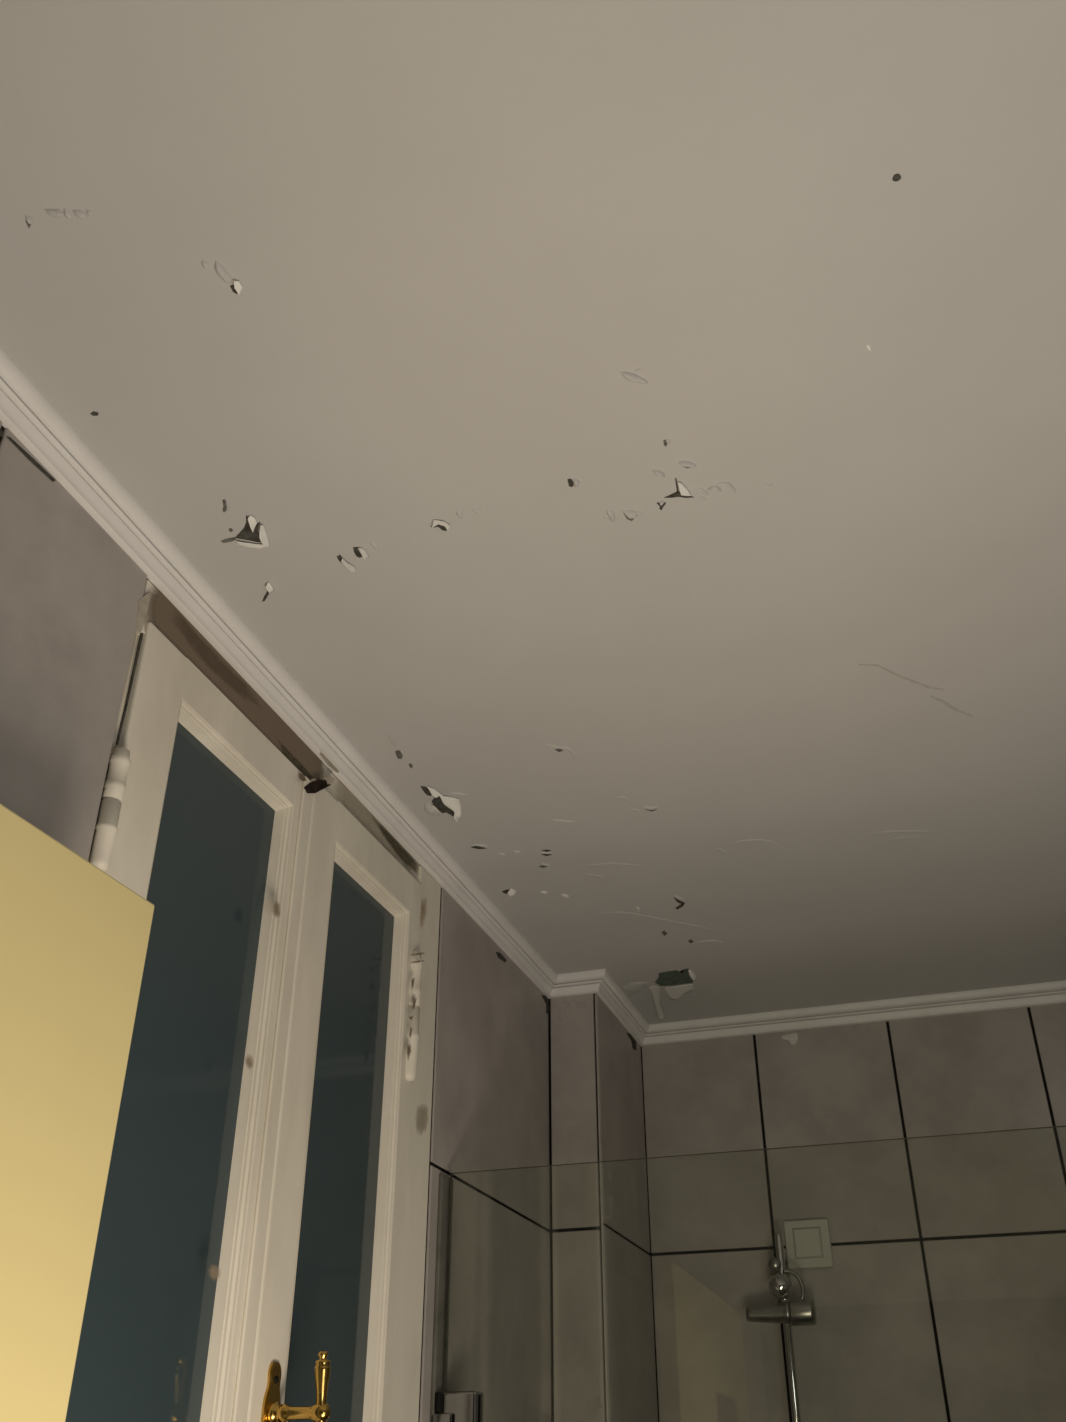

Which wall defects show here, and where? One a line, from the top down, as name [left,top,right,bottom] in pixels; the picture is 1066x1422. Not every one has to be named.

peeling [201,259,243,295]
peeling [664,461,697,498]
peeling [221,499,270,549]
peeling [337,547,369,572]
peeling [420,786,467,823]
peeling [648,969,696,1020]